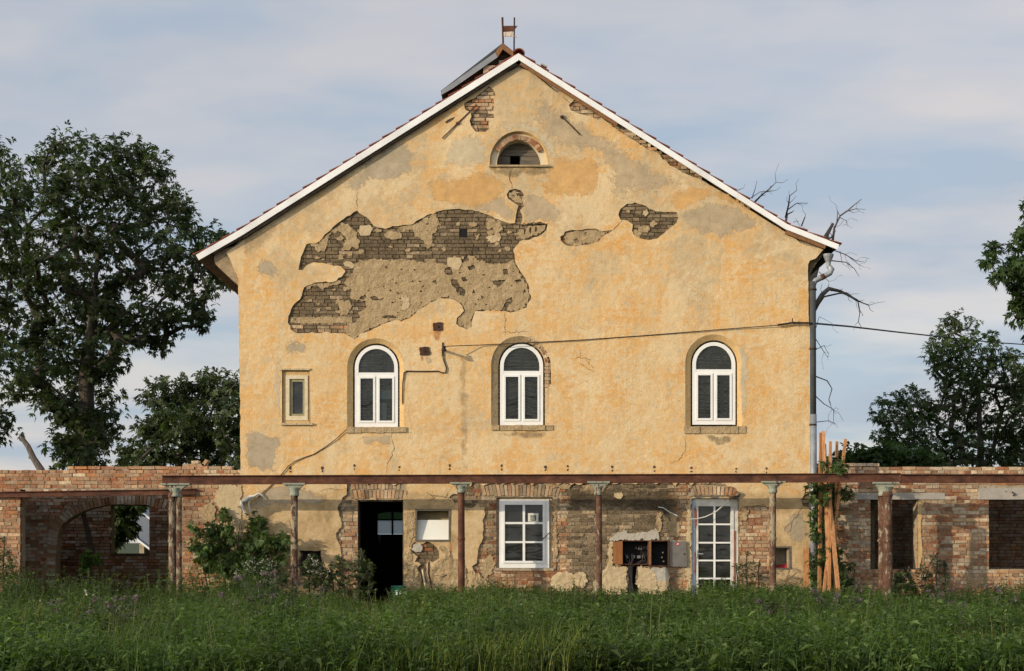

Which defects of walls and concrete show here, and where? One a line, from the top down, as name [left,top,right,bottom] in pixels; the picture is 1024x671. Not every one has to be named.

spalling [464,87,495,132]
spalling [286,100,756,353]
spalling [336,484,410,606]
spalling [403,483,769,598]